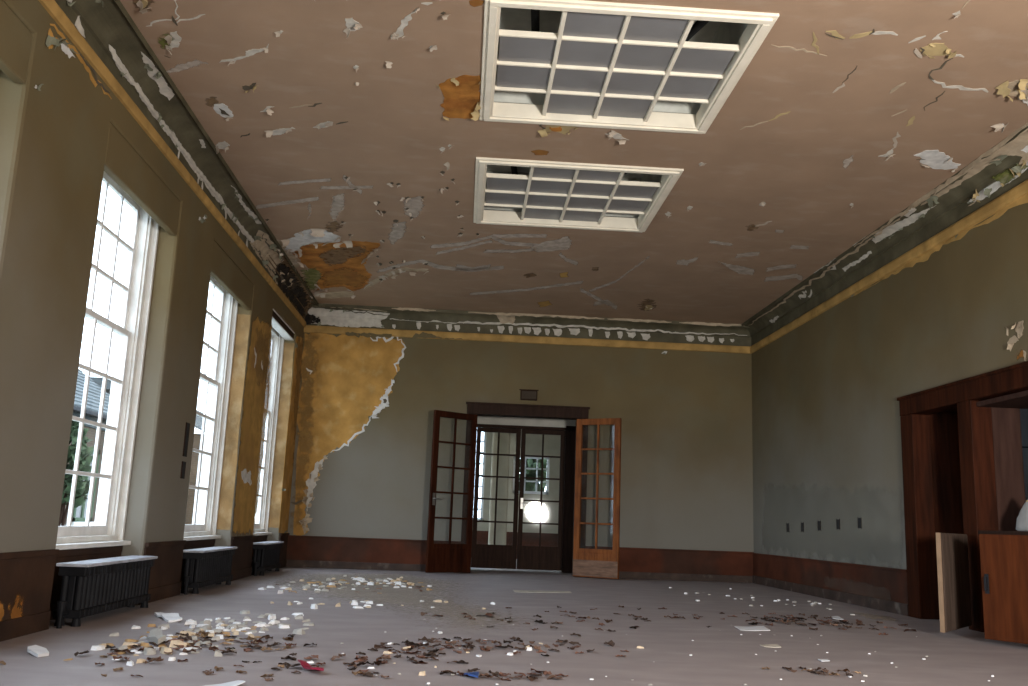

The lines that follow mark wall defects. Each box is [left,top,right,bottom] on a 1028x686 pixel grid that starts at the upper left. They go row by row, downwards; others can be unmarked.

peeling [343,17,363,39]
peeling [391,2,432,40]
peeling [909,31,964,59]
peeling [437,75,481,121]
crack [832,66,857,93]
crack [890,58,988,126]
flaking render [995,79,1028,106]
peeling [109,30,373,284]
peeling [291,122,1028,536]